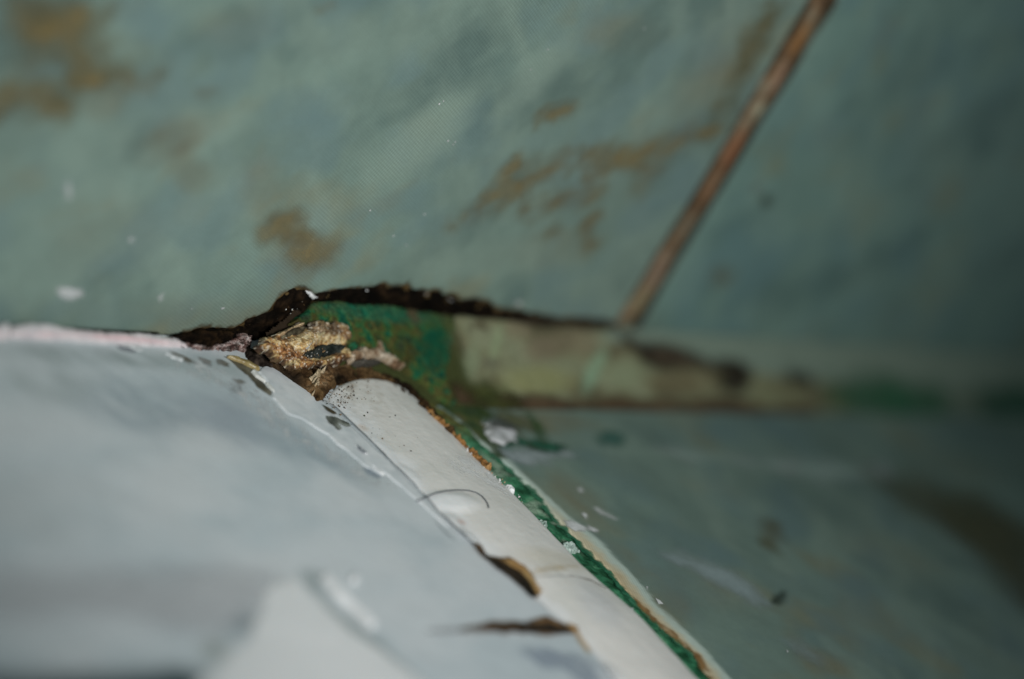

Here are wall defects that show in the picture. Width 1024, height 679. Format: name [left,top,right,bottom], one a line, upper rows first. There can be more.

crack [324,403,400,469]
spalling [172,284,608,528]
crack [423,493,590,651]